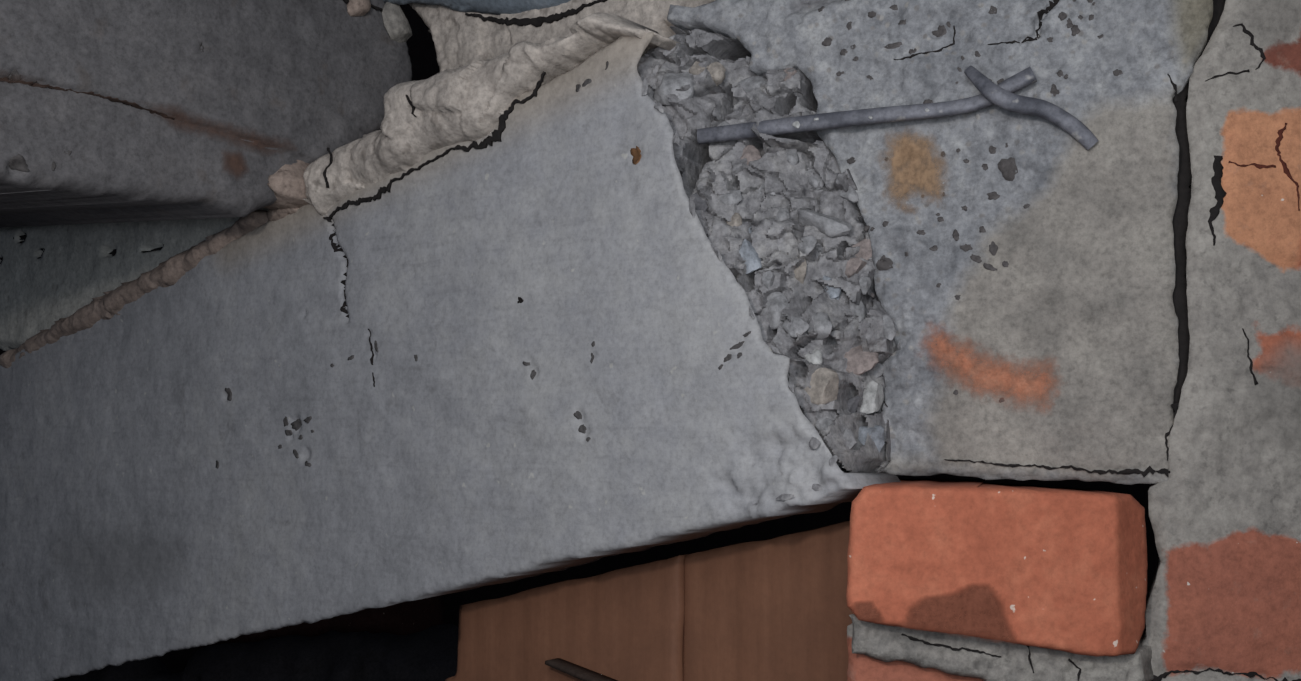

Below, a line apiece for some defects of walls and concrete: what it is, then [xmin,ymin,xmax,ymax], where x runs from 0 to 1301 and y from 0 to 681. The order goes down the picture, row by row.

crack [343,0,383,12]
crack [465,0,607,27]
spalling [868,4,906,25]
spalling [884,42,917,54]
spalling [630,146,642,165]
rust [889,134,943,209]
spalling [941,143,1018,200]
crack [323,71,546,387]
spalling [637,22,906,477]
spalling [936,213,1008,271]
crack [944,0,1300,477]
crack [1151,667,1301,681]